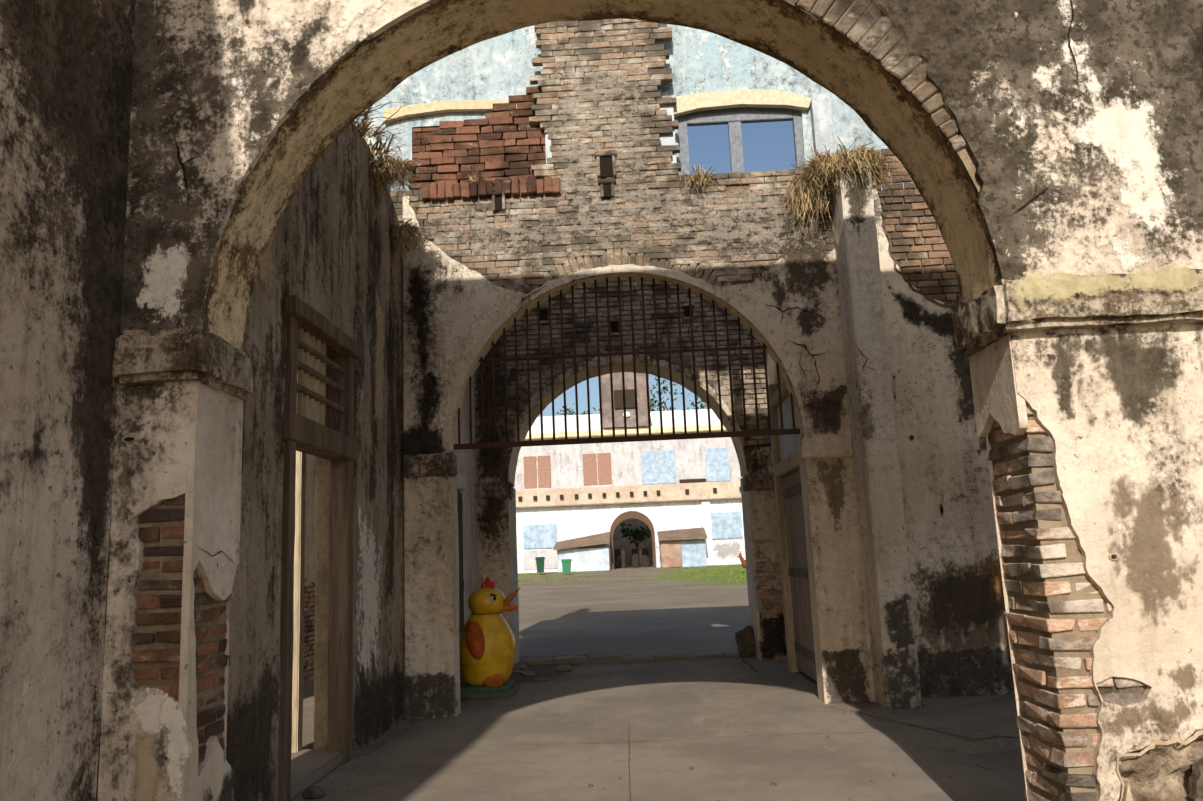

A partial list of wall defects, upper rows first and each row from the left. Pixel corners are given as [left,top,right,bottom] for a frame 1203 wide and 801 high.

damp [299,17,329,47]
crack [1068,0,1081,91]
damp [244,60,288,146]
crack [173,135,197,202]
damp [18,0,134,618]
crack [764,303,875,388]
damp [0,421,46,469]
flaking render [917,404,1147,801]
flaking render [129,495,231,801]
damp [825,549,1016,754]
peeling [203,764,237,801]
flaking render [1116,729,1203,801]